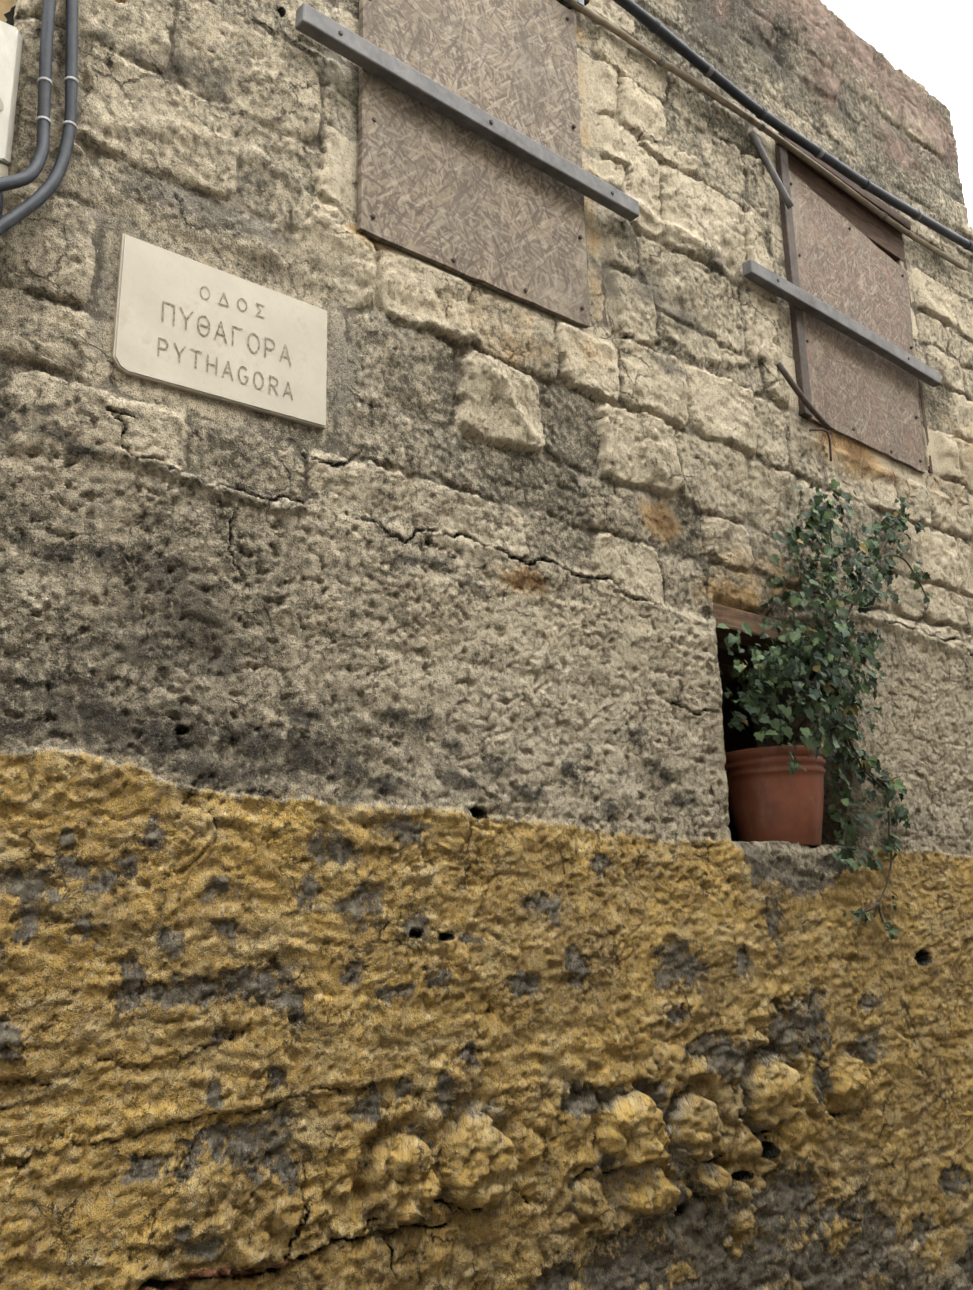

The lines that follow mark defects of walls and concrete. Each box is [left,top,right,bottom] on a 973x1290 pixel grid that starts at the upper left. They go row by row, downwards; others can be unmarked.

crack [106,410,295,592]
crack [303,449,362,468]
spalling [110,927,314,1043]
spalling [200,873,244,907]
spalling [212,919,246,945]
spalling [118,1064,312,1198]
spalling [162,1224,226,1263]
crack [141,1178,480,1290]
spalling [512,1157,973,1290]